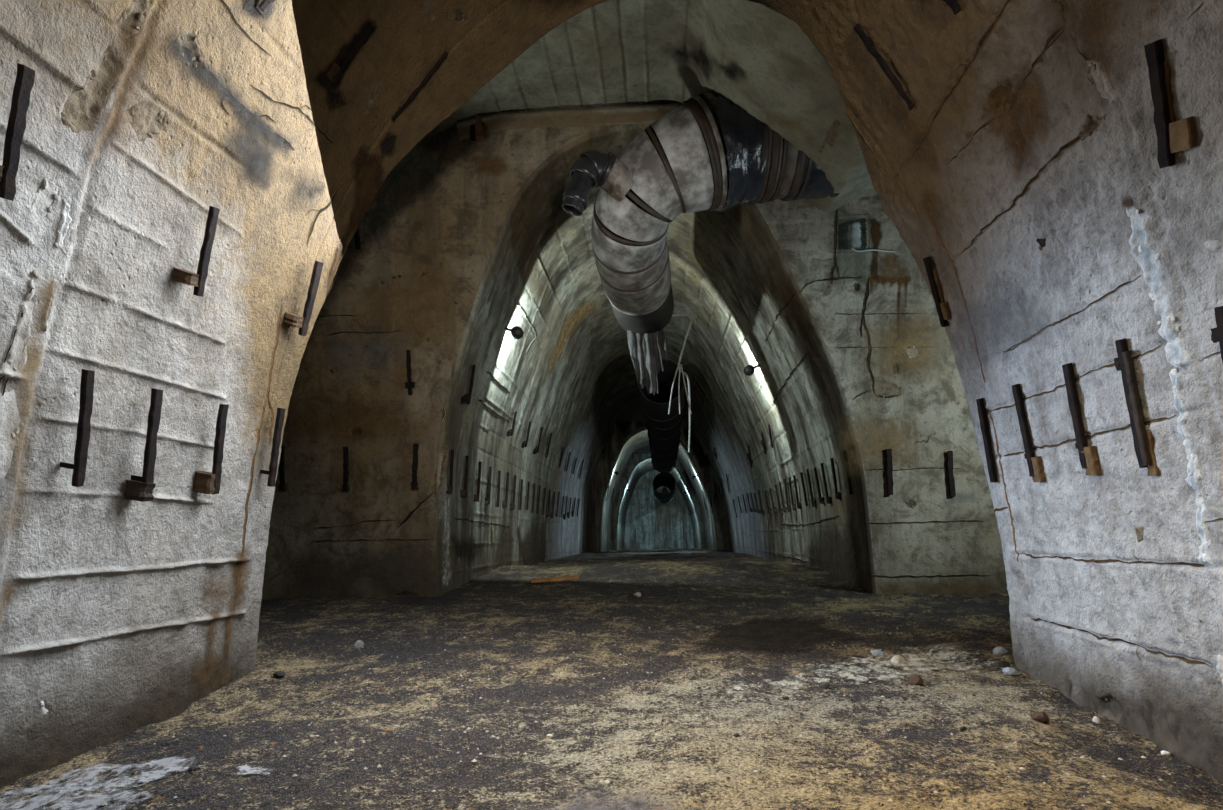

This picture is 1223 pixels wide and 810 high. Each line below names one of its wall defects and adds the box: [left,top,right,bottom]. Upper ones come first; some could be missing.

crack [220,0,272,56]
crack [251,85,334,150]
rust [870,219,911,313]
crack [750,0,1209,567]
water stain [1125,206,1217,569]
crack [872,572,990,580]
water stain [0,735,202,810]